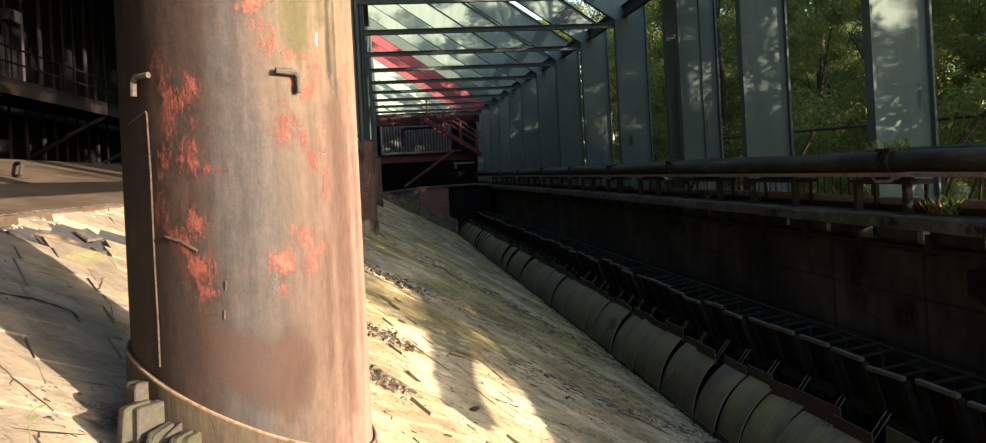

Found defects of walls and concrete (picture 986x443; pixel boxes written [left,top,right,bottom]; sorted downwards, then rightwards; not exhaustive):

crack [0,292,81,323]
crack [1,366,86,443]